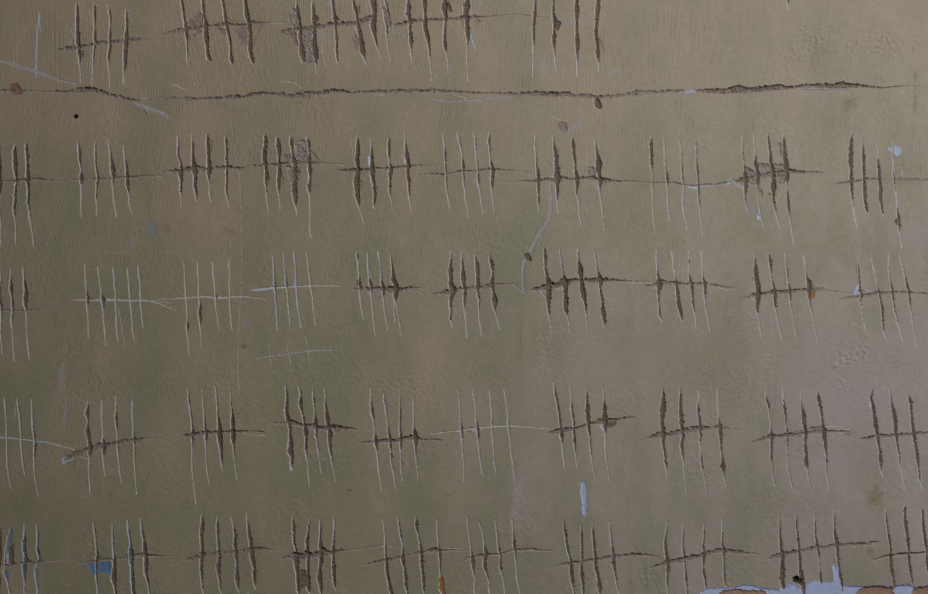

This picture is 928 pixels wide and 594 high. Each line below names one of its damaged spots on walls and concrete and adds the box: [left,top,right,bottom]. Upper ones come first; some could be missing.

peeling [700,564,928,594]